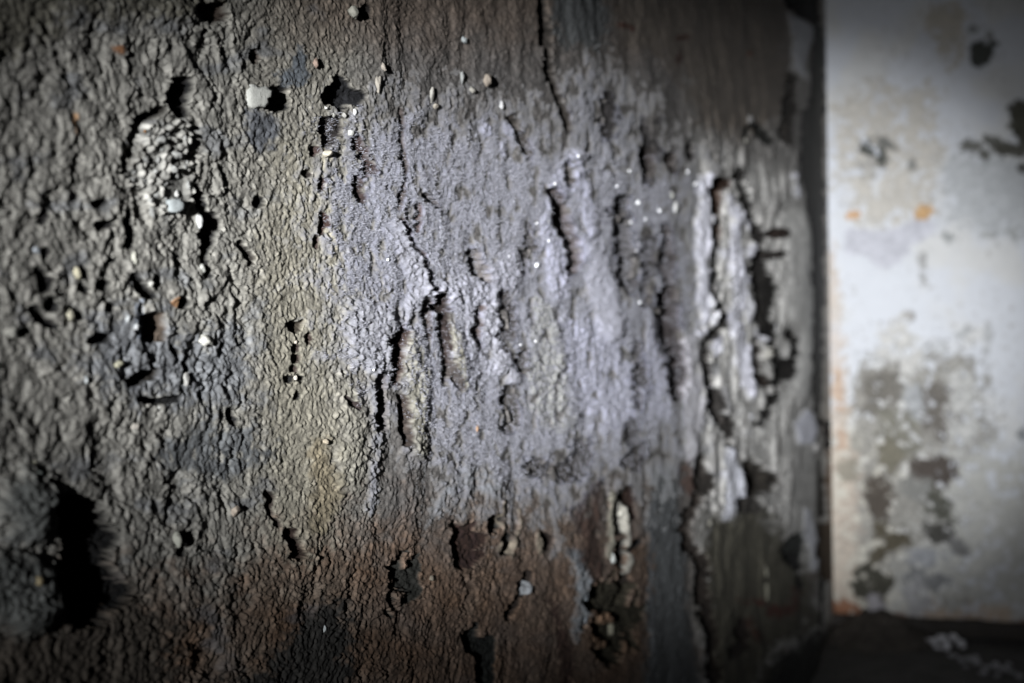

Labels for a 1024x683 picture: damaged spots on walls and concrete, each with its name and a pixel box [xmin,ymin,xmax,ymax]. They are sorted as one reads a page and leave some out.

crack [536,0,574,135]
damp [58,0,833,683]
flaking render [719,446,789,522]
peeling [691,146,939,453]
damp [914,248,930,286]
damp [832,308,1024,620]